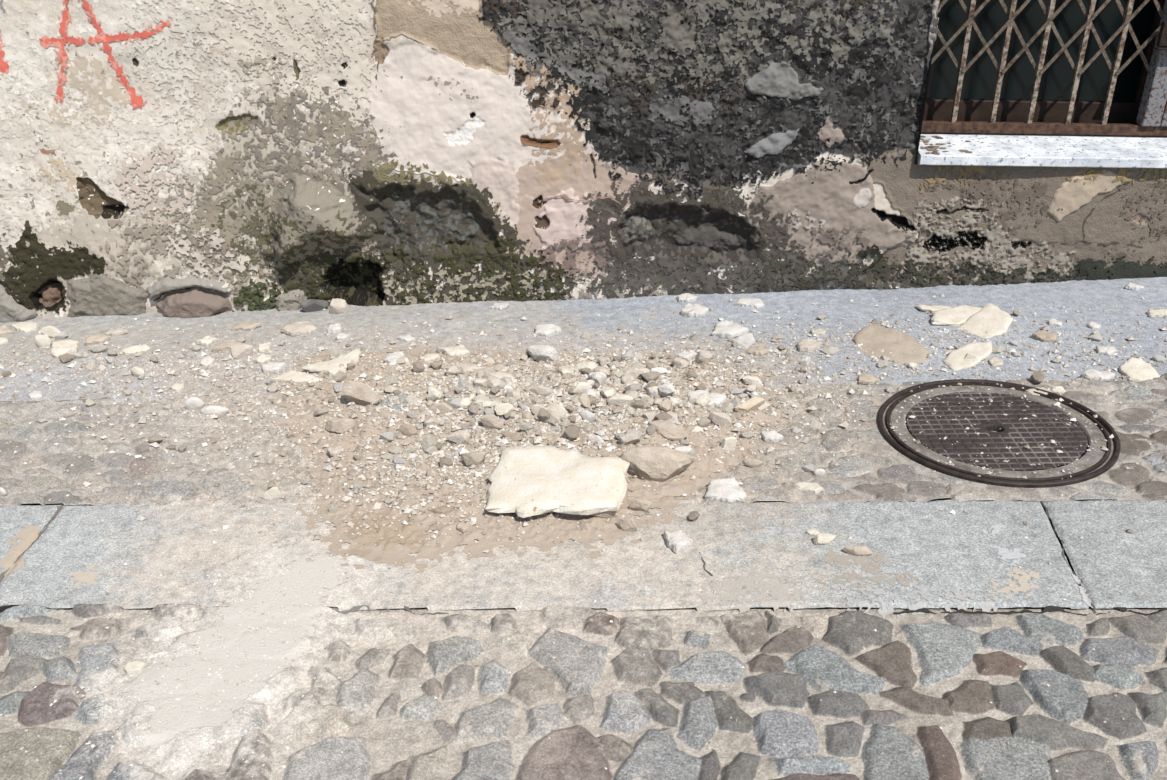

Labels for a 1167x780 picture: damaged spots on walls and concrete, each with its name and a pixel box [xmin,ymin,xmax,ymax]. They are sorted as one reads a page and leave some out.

leakage [0,0,1113,318]
peeling [0,0,1167,306]
leakage [1106,169,1167,251]
flaking render [0,220,259,323]
flaking render [276,289,307,312]
crack [0,504,63,582]
crack [1041,501,1096,614]